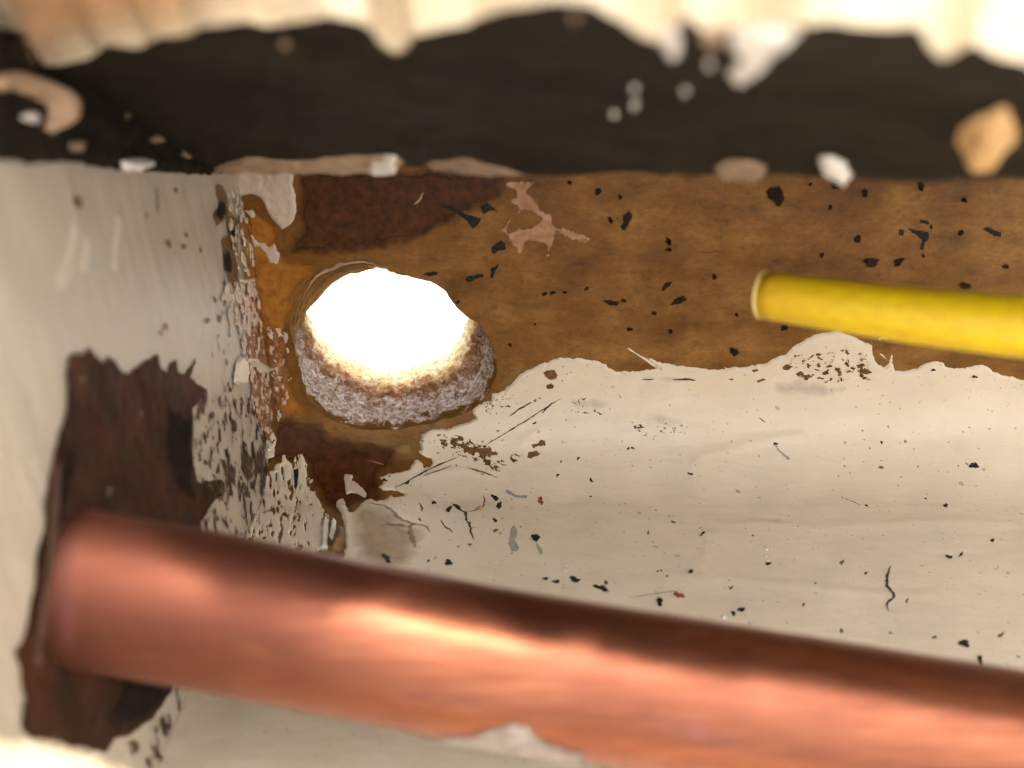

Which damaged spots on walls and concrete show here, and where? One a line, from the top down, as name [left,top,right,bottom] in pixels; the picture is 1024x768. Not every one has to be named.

peeling [369,154,398,176]
peeling [714,159,785,207]
peeling [818,155,853,186]
peeling [251,235,280,264]
spalling [465,241,506,282]
spalling [899,220,933,250]
corrosion [222,279,292,445]
leakage [240,170,504,559]
peeling [543,370,557,389]
peeling [783,350,872,383]
peeling [429,434,546,472]
peeling [15,279,367,768]